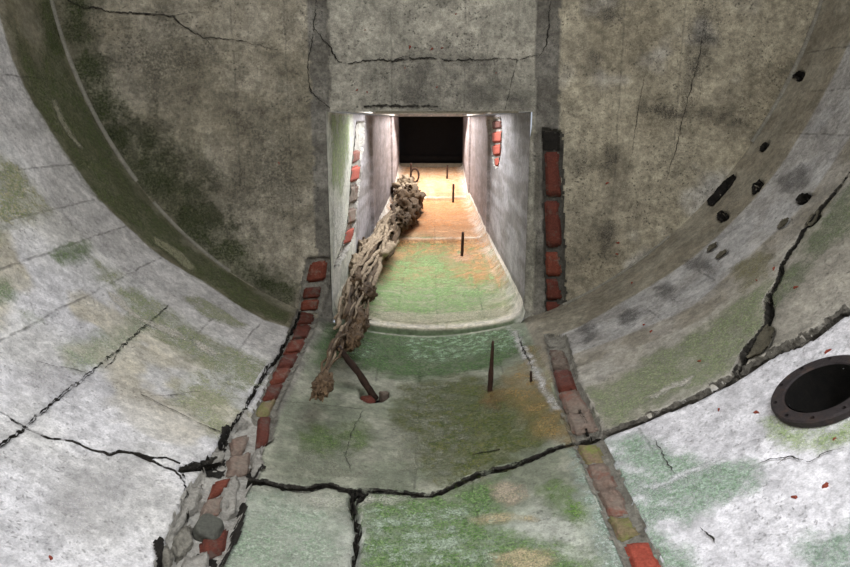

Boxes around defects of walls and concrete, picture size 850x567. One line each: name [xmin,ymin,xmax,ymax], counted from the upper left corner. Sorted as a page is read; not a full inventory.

crack [68,0,277,52]
crack [307,0,551,109]
hole [707,174,736,222]
hole [752,179,764,195]
hole [795,193,812,205]
spalling [706,242,728,258]
crack [732,172,850,380]
crack [10,311,301,522]
crack [750,447,844,468]
crack [246,401,592,567]